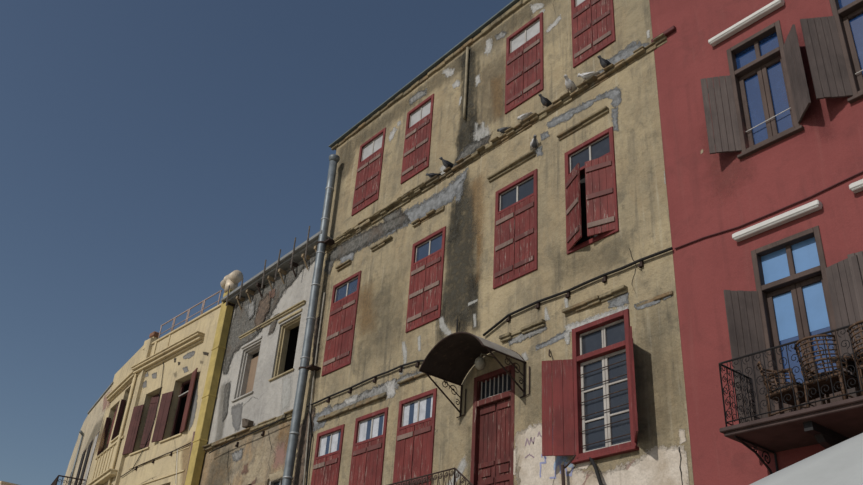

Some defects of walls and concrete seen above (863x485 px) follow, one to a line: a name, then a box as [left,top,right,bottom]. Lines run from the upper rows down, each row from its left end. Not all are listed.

damp [457,51,505,157]
spalling [535,85,622,156]
damp [244,297,255,320]
spalling [222,133,492,422]
damp [438,177,478,341]
spalling [268,369,423,485]
peeling [513,421,689,485]